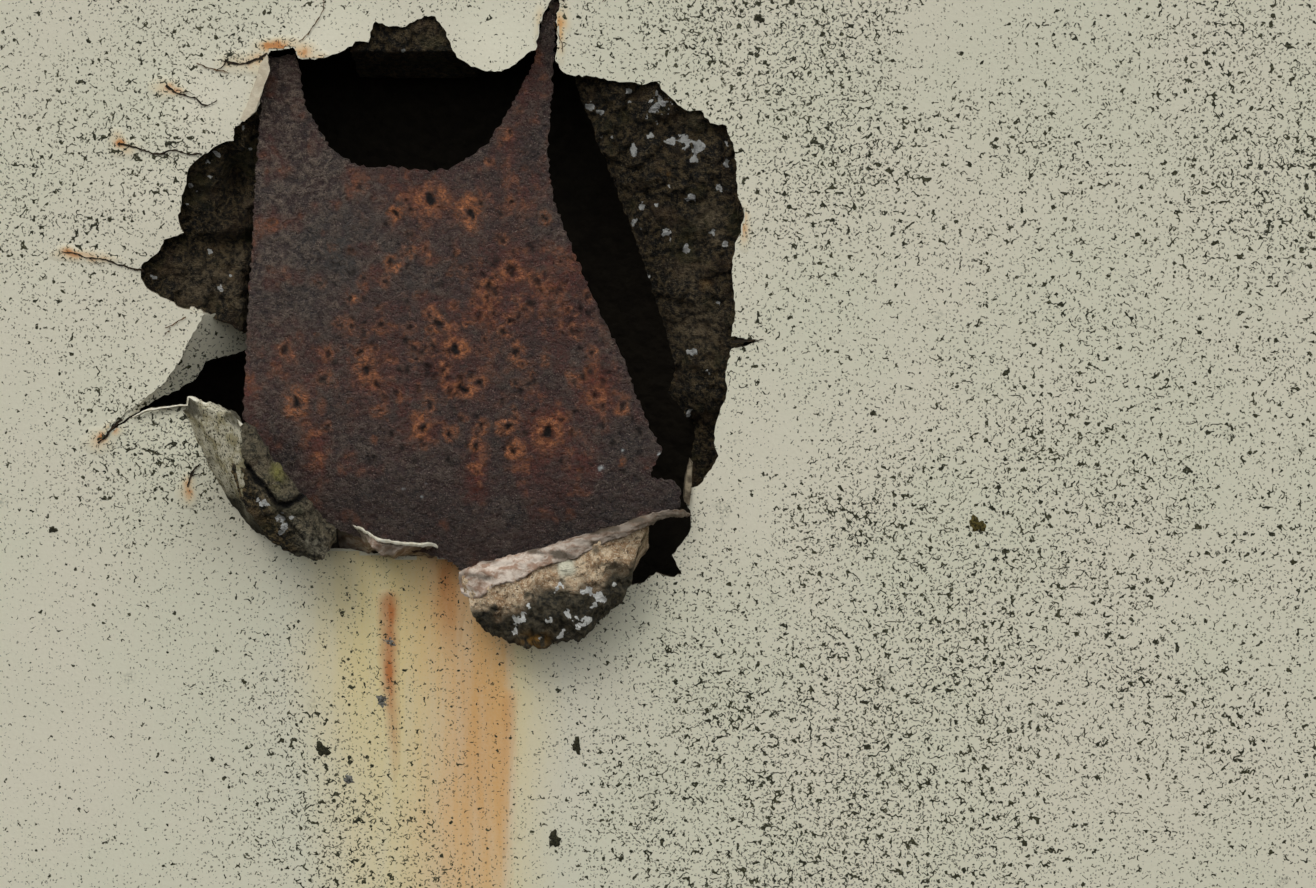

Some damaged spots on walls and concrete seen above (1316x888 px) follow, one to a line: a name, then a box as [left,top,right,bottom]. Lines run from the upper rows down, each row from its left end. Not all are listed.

crack [165,52,268,106]
rust [213,34,331,77]
rust [532,1,574,67]
crack [117,143,202,160]
spalling [103,0,756,649]
rust [282,551,568,888]